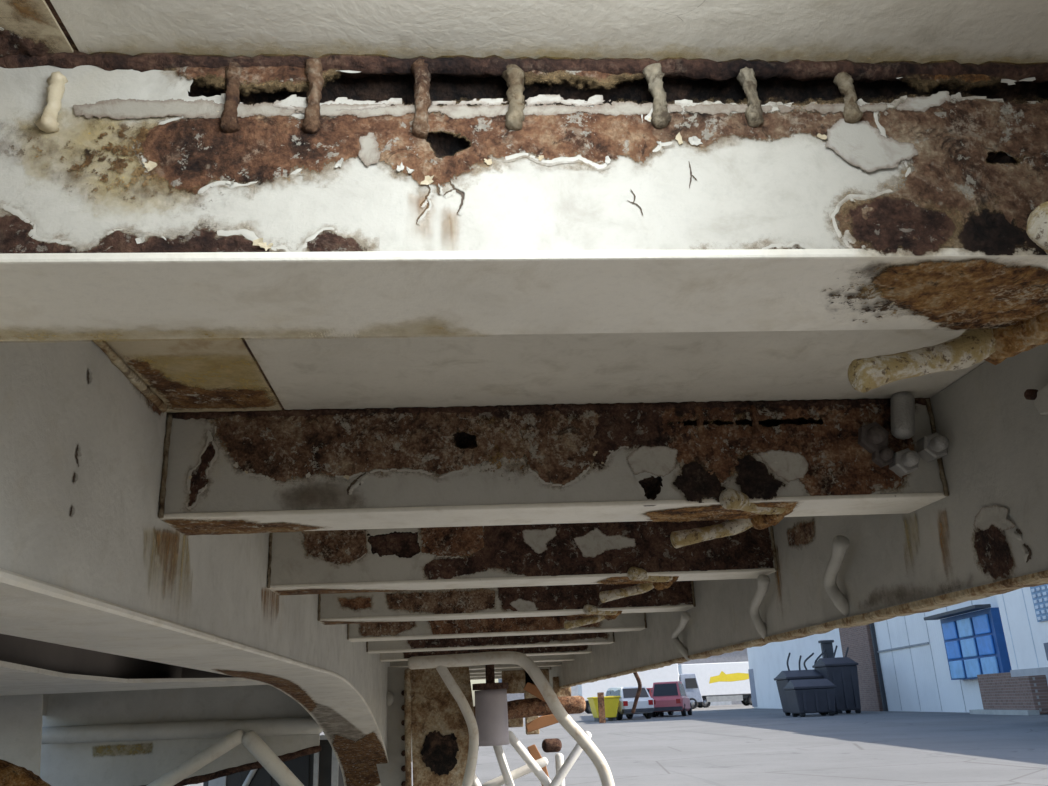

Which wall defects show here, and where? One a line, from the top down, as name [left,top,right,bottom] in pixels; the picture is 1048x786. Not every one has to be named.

peeling [358,132,381,166]
peeling [237,94,509,119]
corrosion [0,101,844,207]
peeling [523,94,653,116]
peeling [667,103,748,115]
peeling [761,91,951,172]
corrosion [0,202,375,254]
crack [416,180,468,225]
corrosion [823,74,1048,330]
corrosion [124,356,916,659]
peeling [574,528,636,558]
corrosion [214,669,388,786]